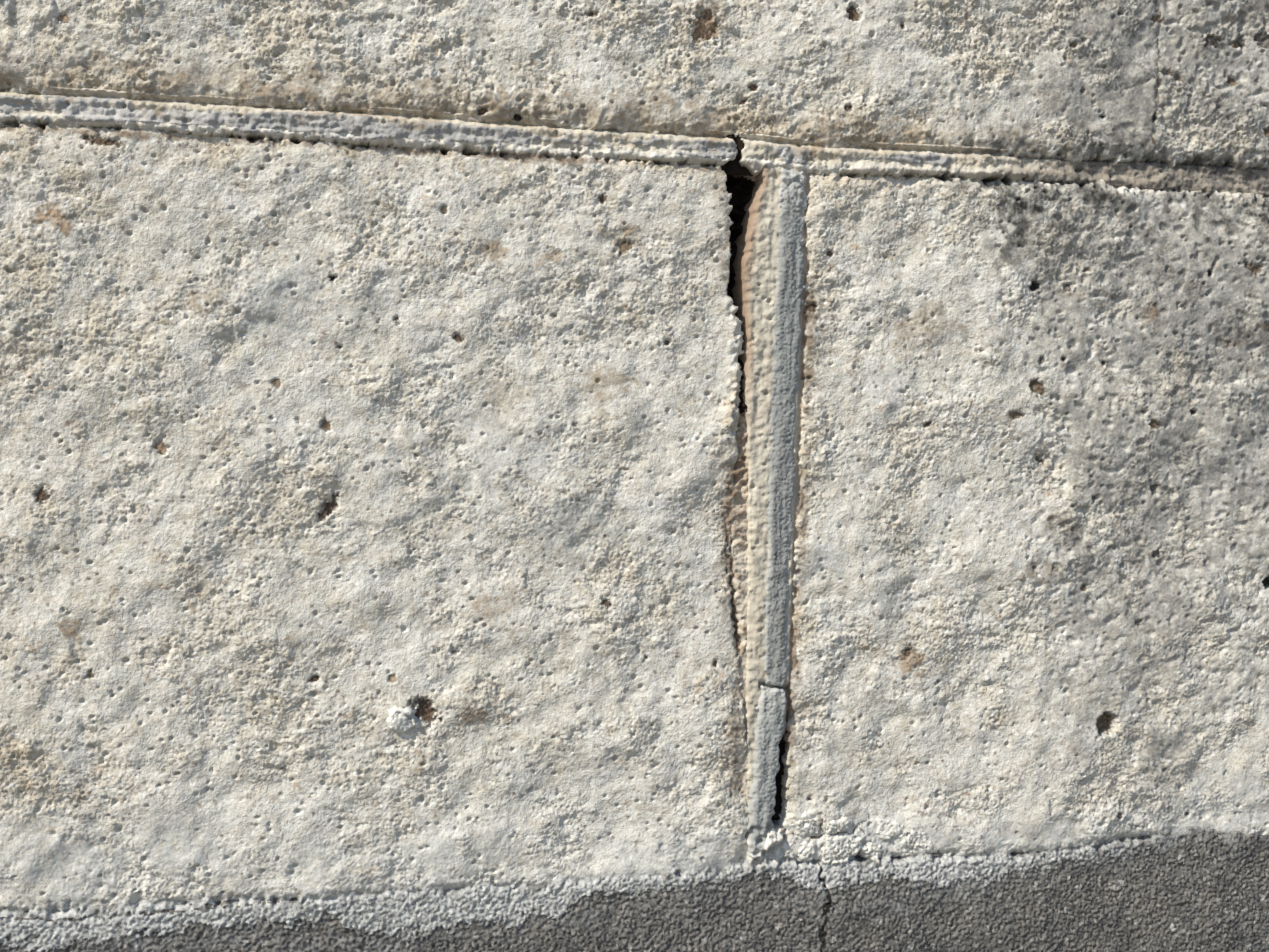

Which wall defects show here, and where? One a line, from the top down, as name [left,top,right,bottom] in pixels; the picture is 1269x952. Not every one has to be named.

crack [721,134,755,316]
crack [727,358,747,439]
crack [724,521,741,657]